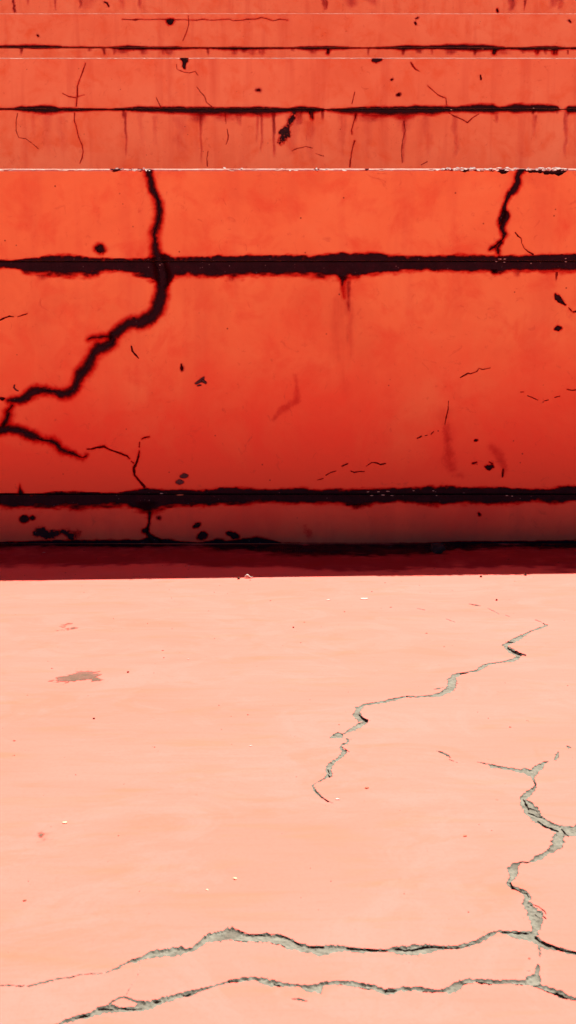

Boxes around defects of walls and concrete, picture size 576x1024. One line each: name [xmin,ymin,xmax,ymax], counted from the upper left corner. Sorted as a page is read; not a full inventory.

water stain [0,44,576,55]
water stain [0,103,576,144]
crack [488,169,534,255]
water stain [0,252,576,290]
crack [0,169,170,543]
water stain [0,485,576,513]
crack [311,604,548,806]
crack [0,746,576,1024]